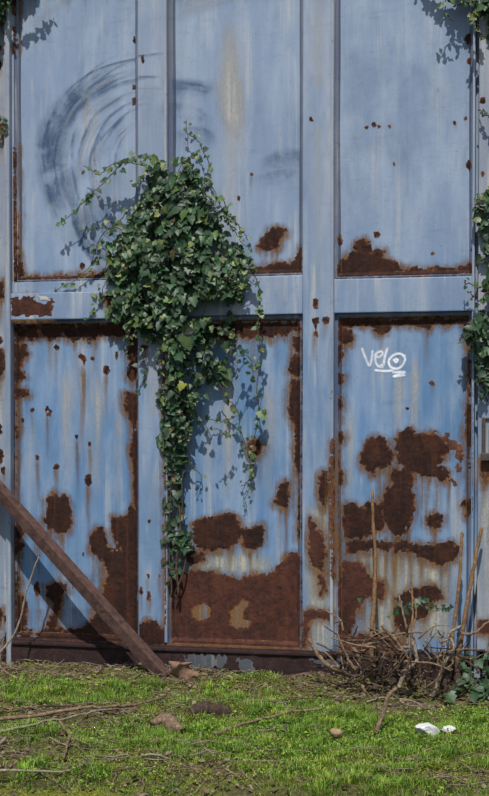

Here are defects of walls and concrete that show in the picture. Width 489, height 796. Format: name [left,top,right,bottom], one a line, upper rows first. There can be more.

corrosion [0,146,489,663]
peeling [183,653,255,674]